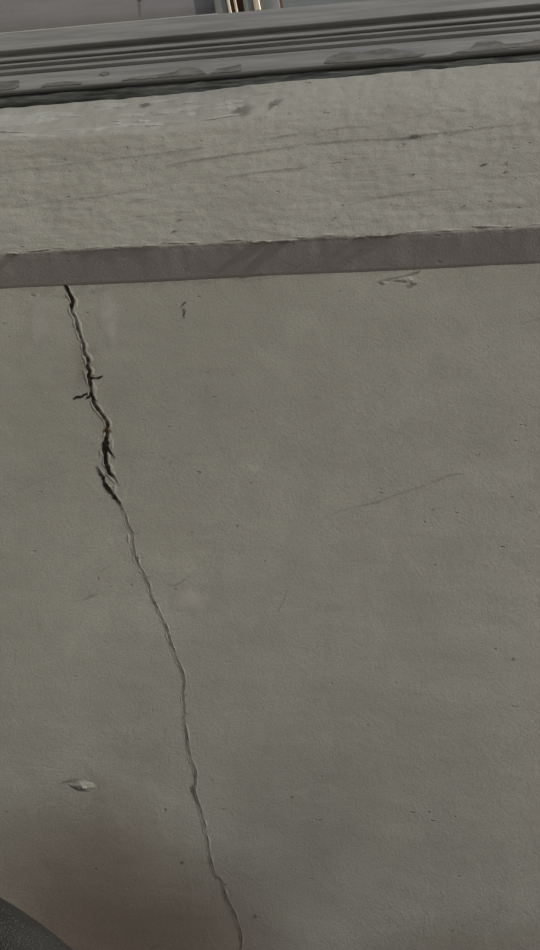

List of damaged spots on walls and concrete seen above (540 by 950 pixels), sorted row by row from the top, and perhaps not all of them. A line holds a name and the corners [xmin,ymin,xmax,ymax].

crack [64,285,244,950]